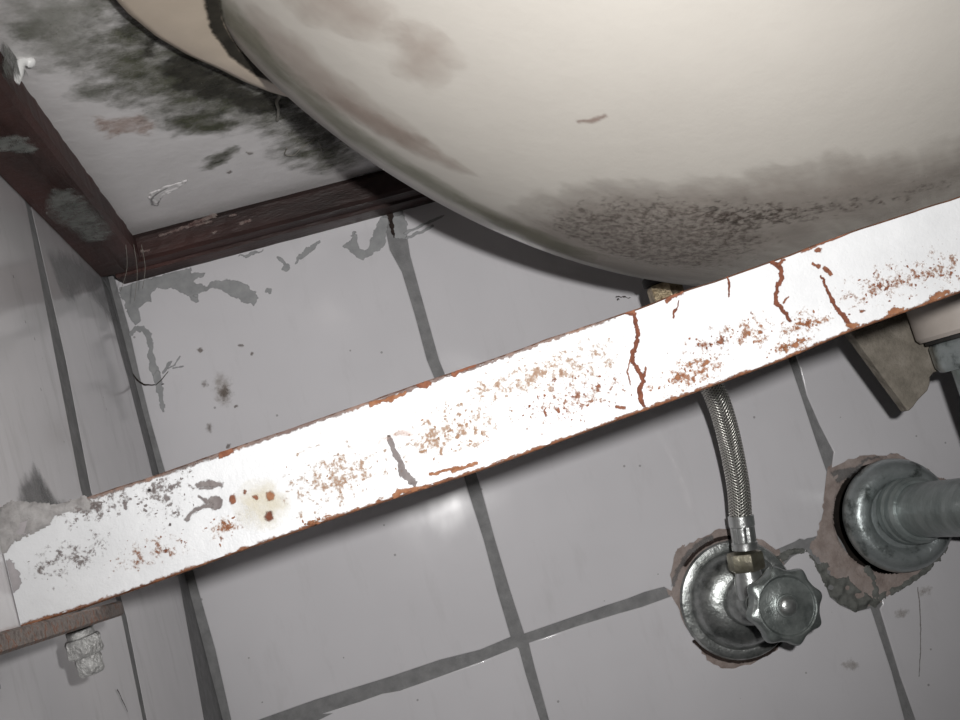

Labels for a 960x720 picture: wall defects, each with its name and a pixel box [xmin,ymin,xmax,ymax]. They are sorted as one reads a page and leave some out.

water stain [88,13,353,170]
water stain [208,149,234,174]
crack [770,259,792,322]
corrosion [801,233,847,253]
crack [812,262,853,324]
corrosion [88,254,960,557]
crack [625,310,647,407]
corrosion [21,560,212,626]
peeling [28,470,223,580]
corrosion [127,533,187,571]
spalling [667,529,782,669]
spalling [756,453,948,612]